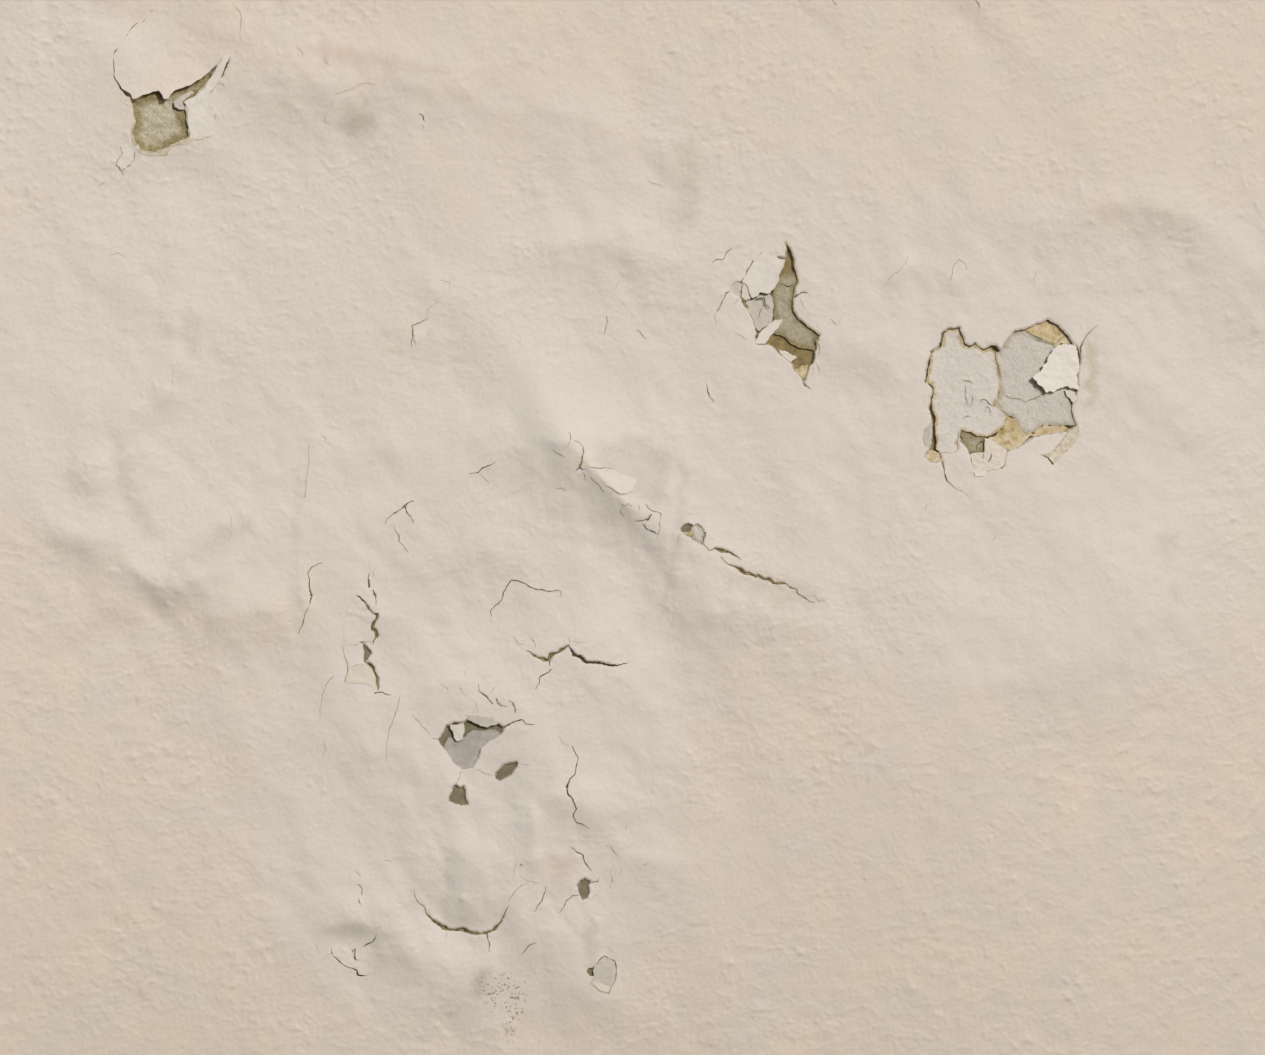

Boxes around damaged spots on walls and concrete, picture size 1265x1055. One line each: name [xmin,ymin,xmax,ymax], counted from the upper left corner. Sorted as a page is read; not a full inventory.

peeling [113,10,230,174]
peeling [714,241,821,390]
peeling [923,318,1098,493]
crack [554,433,661,536]
crack [490,580,562,616]
crack [721,557,828,605]
crack [438,635,626,712]
peeling [413,705,535,806]
crack [561,740,647,875]
crack [414,860,546,948]